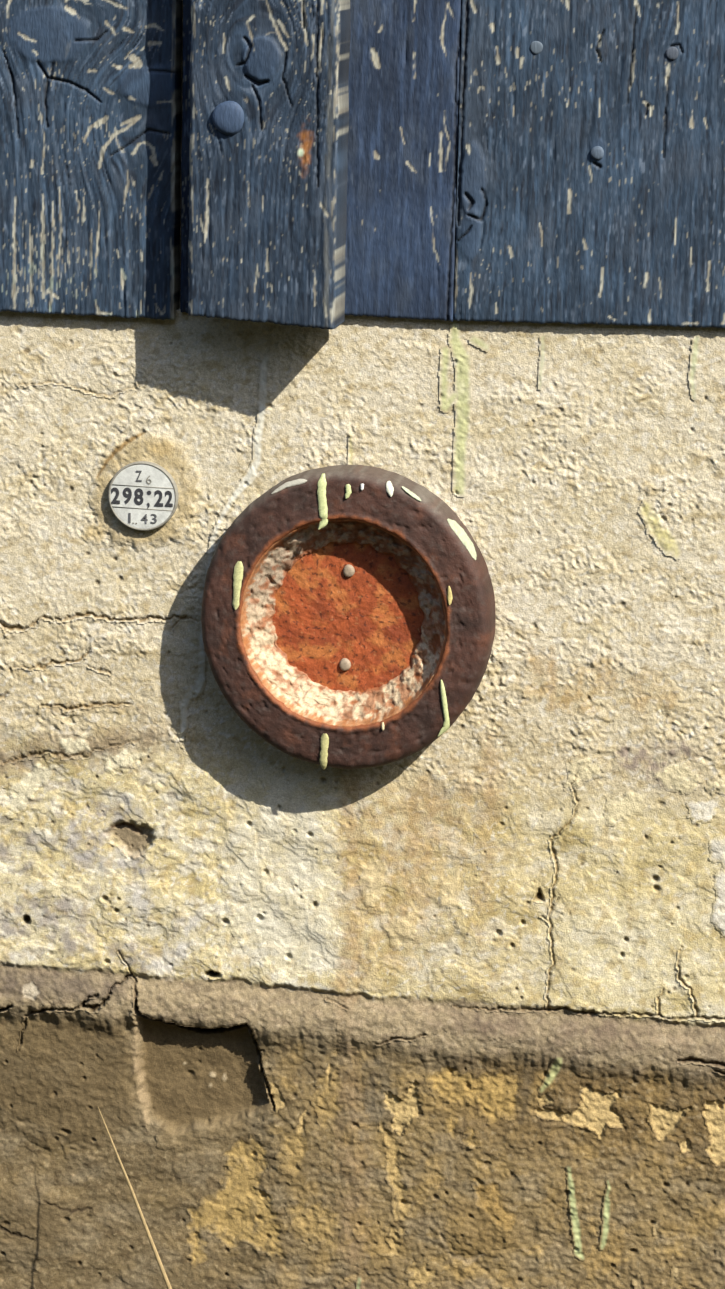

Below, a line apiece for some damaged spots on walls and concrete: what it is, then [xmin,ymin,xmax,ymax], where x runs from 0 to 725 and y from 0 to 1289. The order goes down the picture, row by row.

crack [0,611,200,712]
crack [2,739,141,766]
crack [452,773,725,1023]
crack [0,950,276,1113]
flaking render [129,984,344,1271]
peeling [379,1064,524,1289]
peeling [534,1084,625,1140]
peeling [647,1098,725,1167]